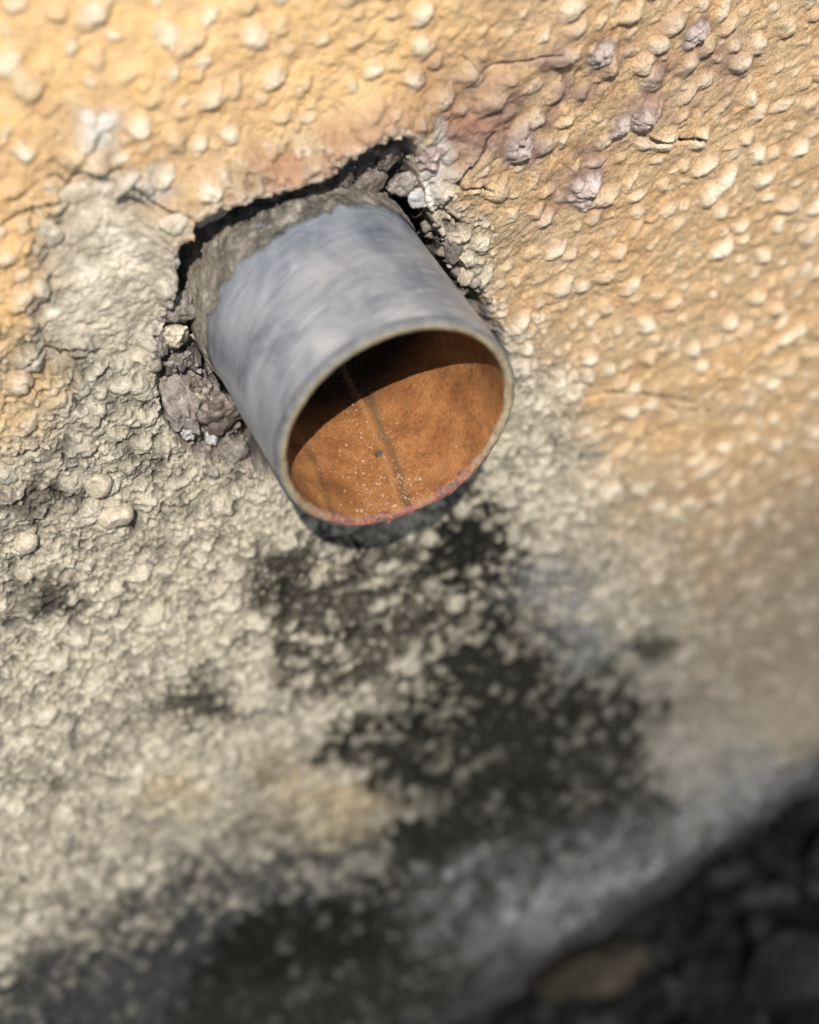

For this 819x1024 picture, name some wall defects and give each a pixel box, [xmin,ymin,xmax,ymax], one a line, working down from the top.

spalling [38,128,518,497]
leakage [0,490,819,1024]